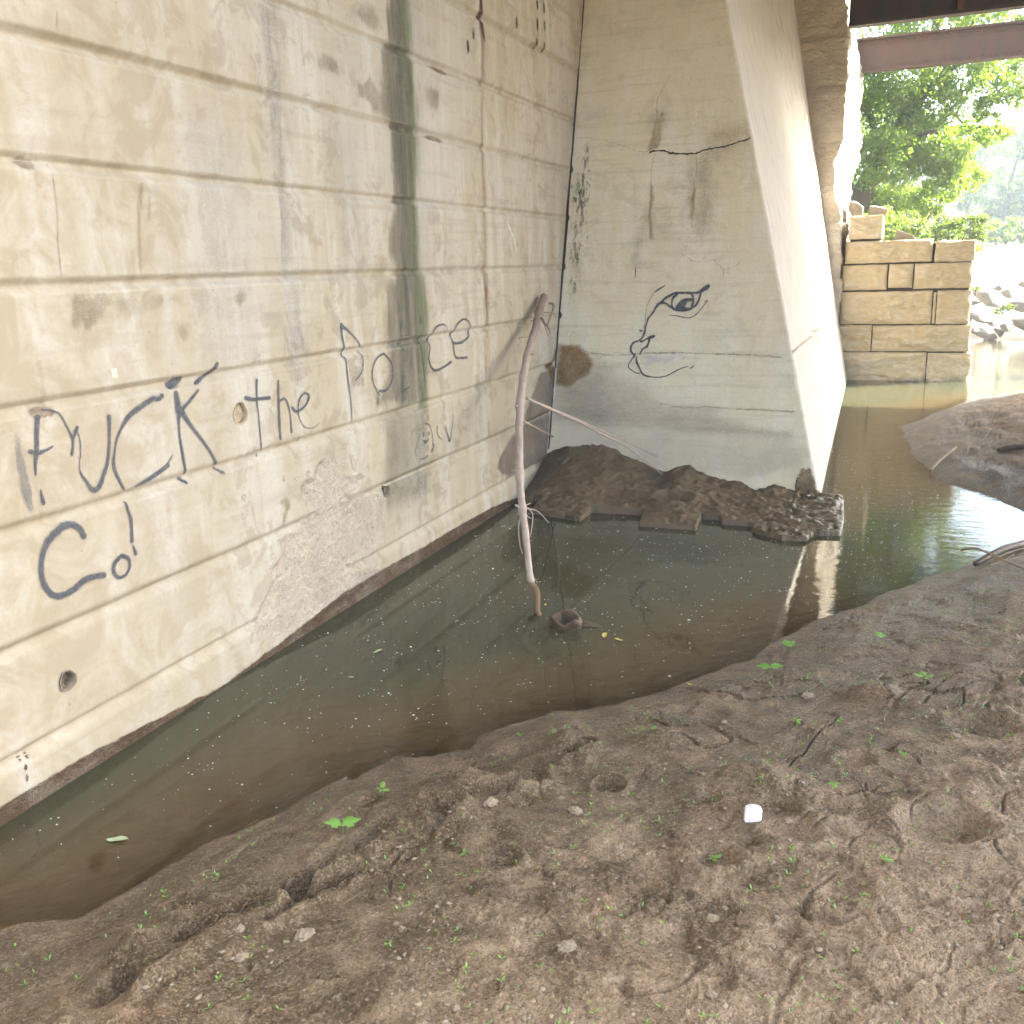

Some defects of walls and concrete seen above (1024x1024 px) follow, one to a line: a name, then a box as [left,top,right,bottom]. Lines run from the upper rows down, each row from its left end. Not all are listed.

water stain [380,0,440,519]
mould [565,140,592,303]
crack [580,137,751,208]
spalling [250,444,387,644]